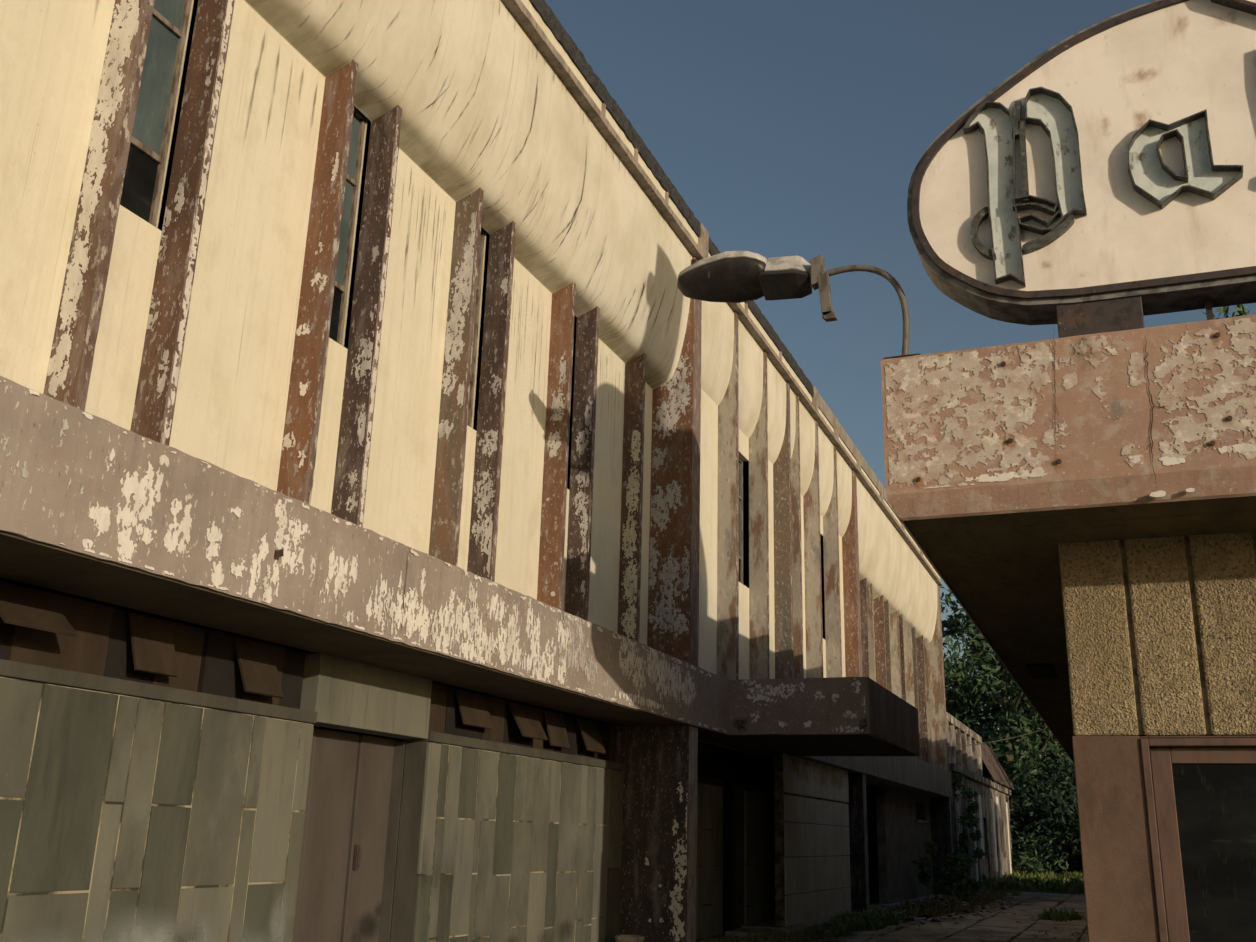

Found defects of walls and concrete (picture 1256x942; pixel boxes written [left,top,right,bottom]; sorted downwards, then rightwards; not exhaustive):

peeling [29,0,140,437]
peeling [82,0,727,733]
peeling [885,318,1256,490]
crack [1144,339,1166,487]
peeling [741,678,865,732]
peeling [648,781,687,942]